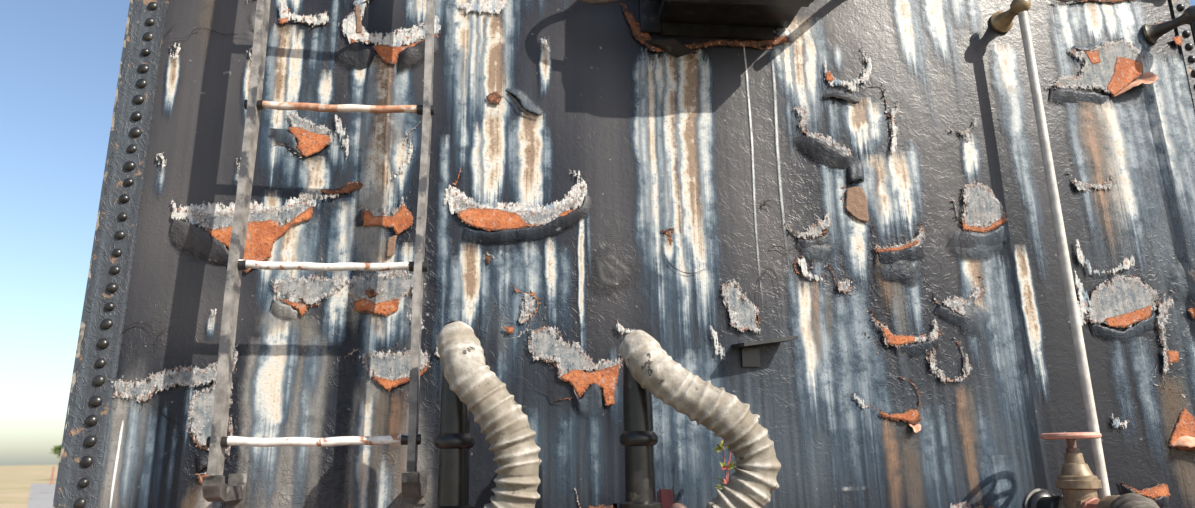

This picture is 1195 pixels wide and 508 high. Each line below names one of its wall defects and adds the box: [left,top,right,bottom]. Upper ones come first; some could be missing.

peeling [169,182,364,273]
water stain [241,0,419,508]
peeling [278,0,441,74]
water stain [406,0,590,350]
peeling [443,165,591,264]
water stain [893,0,980,99]
water stain [960,42,1048,428]
peeling [1048,37,1158,106]
water stain [1052,0,1195,270]
peeling [503,285,623,416]
peeling [1075,239,1195,451]
corrosion [1163,379,1193,486]